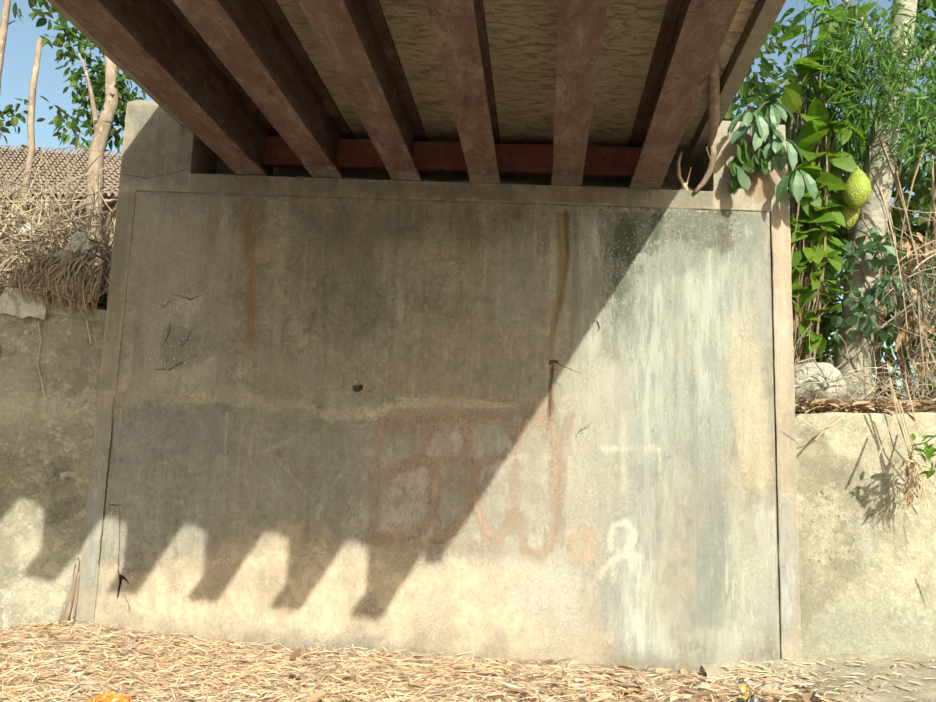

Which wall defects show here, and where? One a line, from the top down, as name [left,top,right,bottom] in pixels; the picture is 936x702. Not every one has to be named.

crack [73,395,130,611]
water stain [83,419,168,586]
water stain [328,206,766,662]